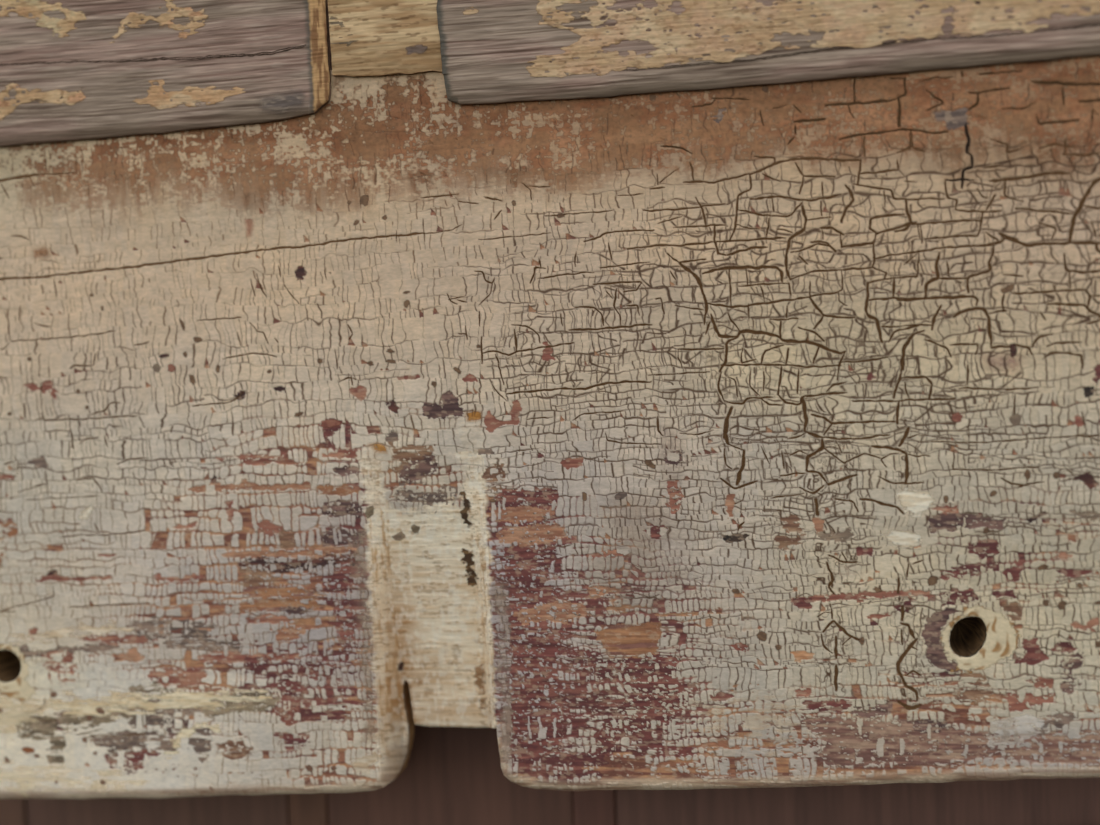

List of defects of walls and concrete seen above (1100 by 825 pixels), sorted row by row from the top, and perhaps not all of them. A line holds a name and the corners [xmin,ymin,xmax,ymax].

crack [623,46,853,71]
peeling [526,0,1100,78]
crack [881,24,1096,45]
crack [0,71,1100,531]
crack [0,590,149,612]
peeling [16,450,374,774]
peeling [478,449,587,761]
peeling [584,624,686,756]
crack [817,552,859,691]
peeling [791,495,1024,702]
crack [896,560,923,710]
peeling [795,638,1100,766]